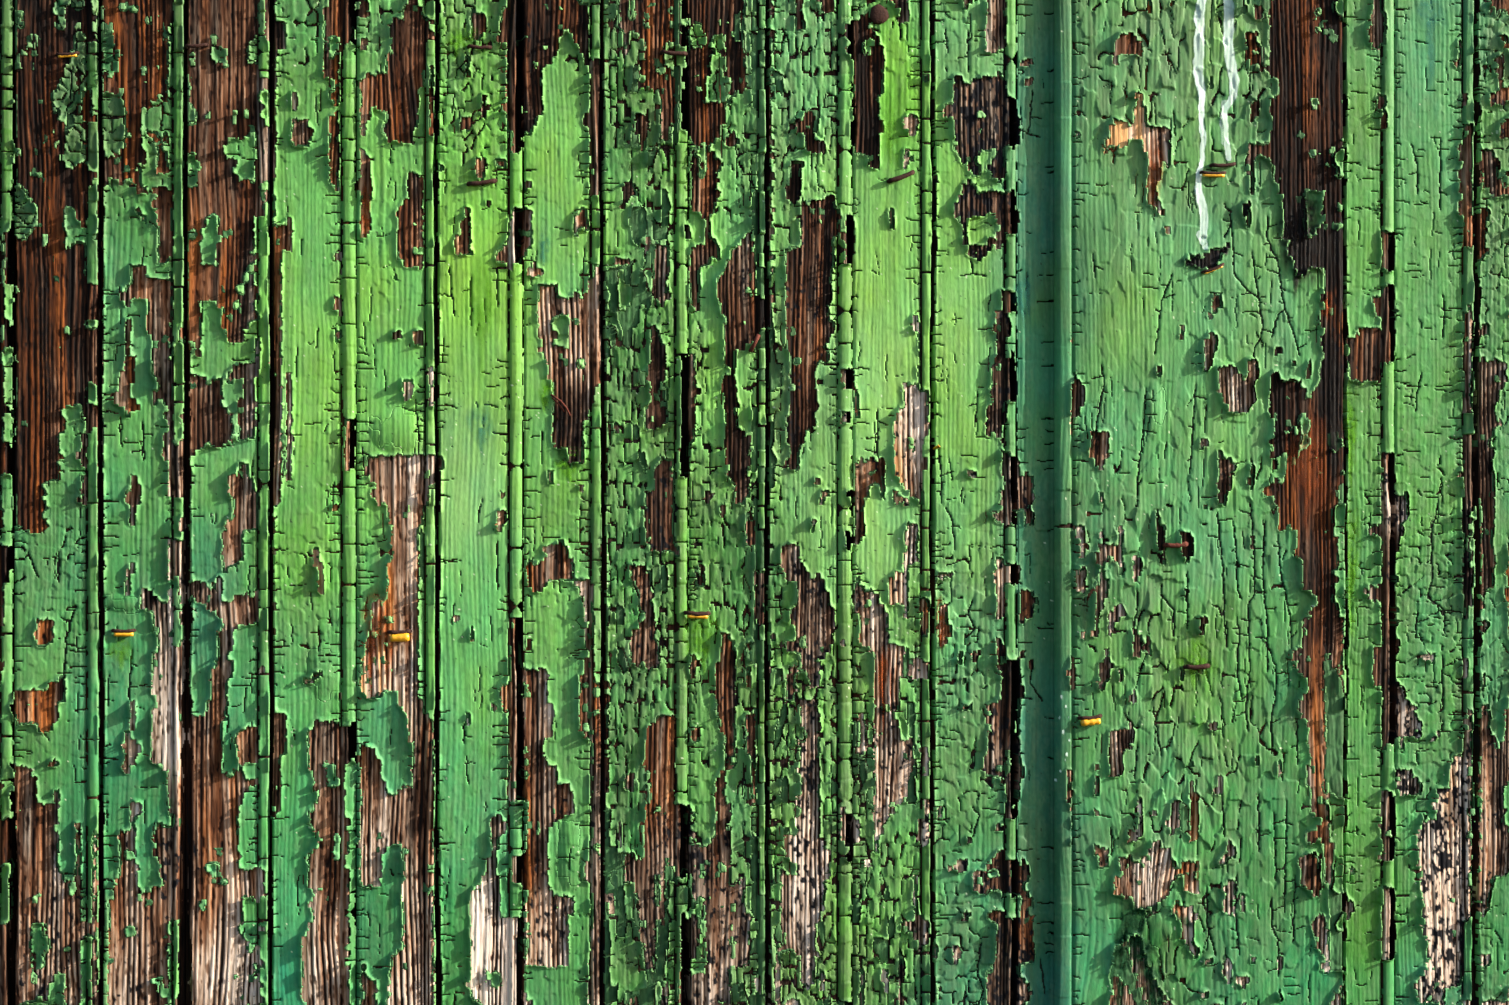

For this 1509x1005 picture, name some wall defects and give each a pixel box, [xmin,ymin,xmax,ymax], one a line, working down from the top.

peeling [943,71,1021,262]
peeling [459,0,857,670]
crack [865,412,886,455]
peeling [845,383,930,546]
crack [1132,389,1155,496]
crack [1188,384,1206,469]
crack [1228,211,1303,362]
peeling [1201,0,1390,1005]
crack [1132,503,1298,761]
peeling [466,524,951,1005]
peeling [1095,776,1256,1005]
crack [1205,795,1303,1005]